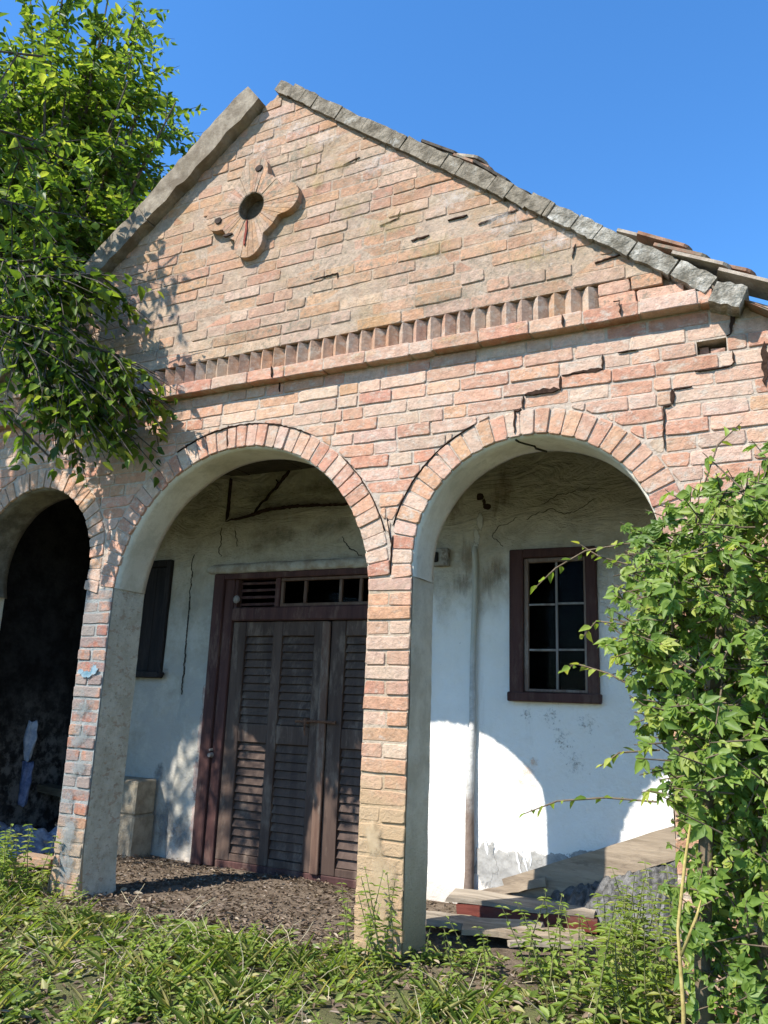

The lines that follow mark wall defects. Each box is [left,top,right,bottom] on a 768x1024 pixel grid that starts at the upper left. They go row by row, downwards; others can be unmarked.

crack [513,349,637,453]
crack [492,486,594,547]
crack [177,423,474,695]
peeling [78,665,98,678]
peeling [474,841,592,888]